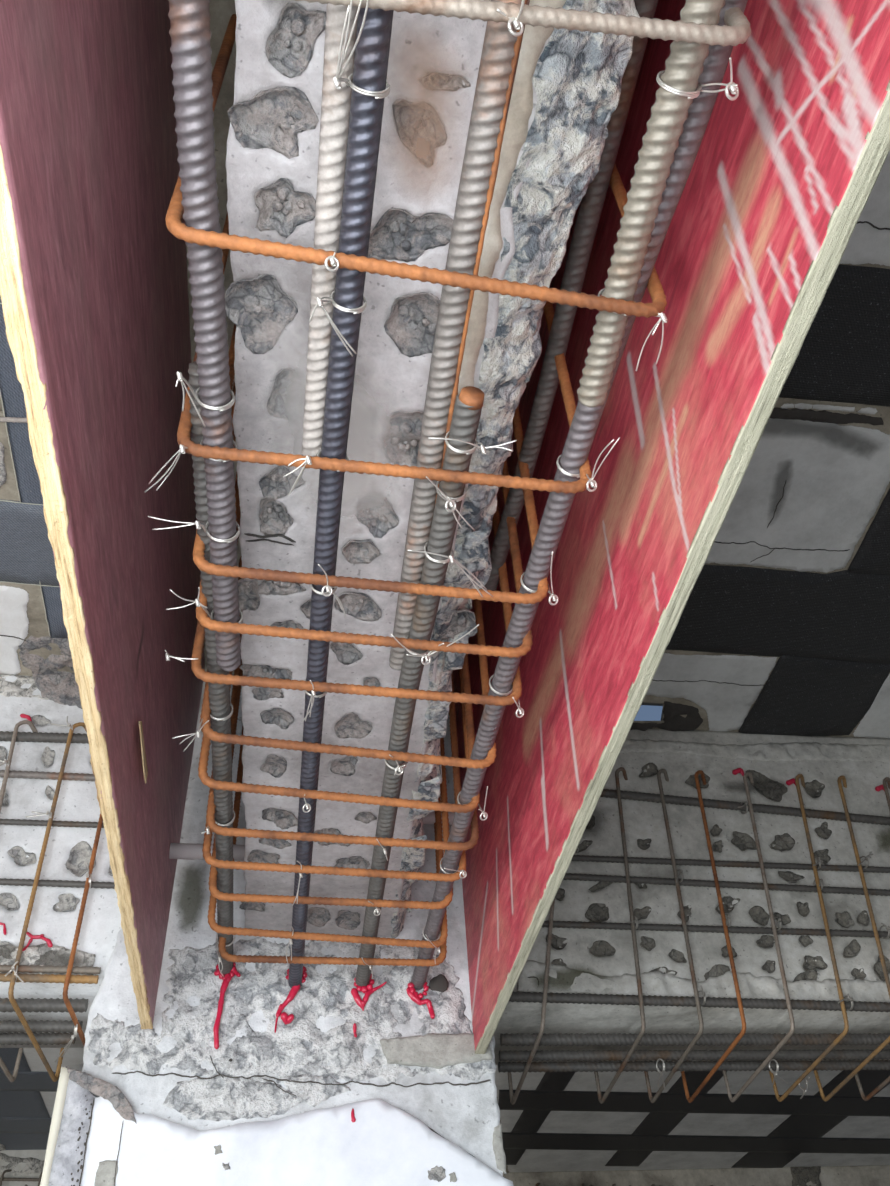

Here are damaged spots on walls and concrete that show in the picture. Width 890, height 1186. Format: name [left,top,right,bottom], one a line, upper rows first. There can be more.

spalling [562,0,640,18]
spalling [227,2,326,159]
crack [714,481,850,562]
spalling [65,28,634,1124]
crack [112,1056,490,1111]
crack [71,1095,94,1186]
crack [114,1123,123,1185]